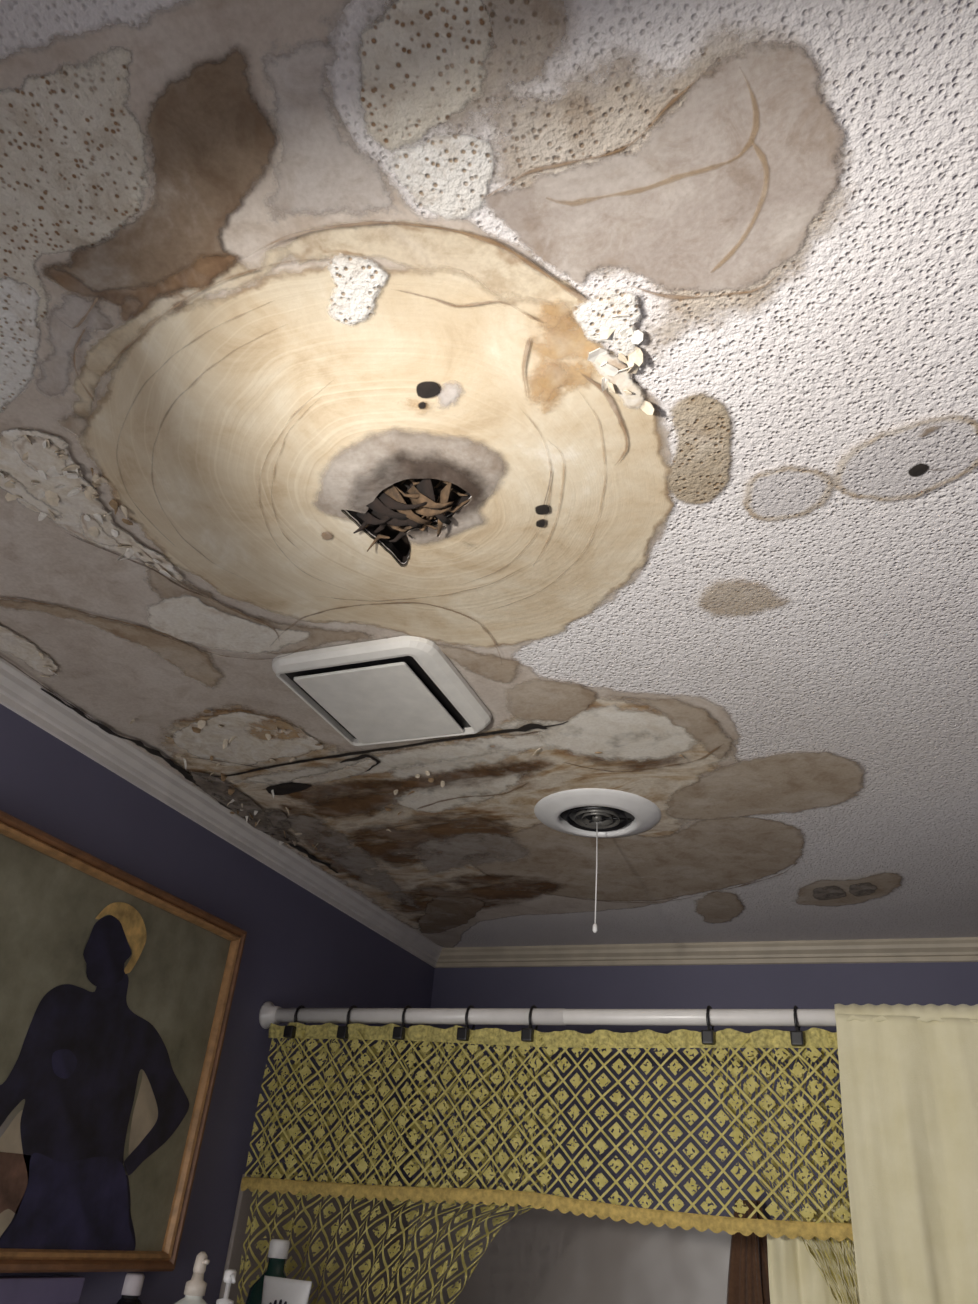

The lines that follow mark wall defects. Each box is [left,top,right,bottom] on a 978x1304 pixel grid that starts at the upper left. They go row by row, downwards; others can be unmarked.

water stain [43,49,589,420]
water stain [654,192,840,343]
water stain [315,429,506,544]
peeling [0,0,845,790]
water stain [666,394,731,504]
water stain [743,415,978,521]
crack [40,688,568,873]
water stain [141,553,864,934]
peeling [284,843,678,948]
water stain [795,873,901,906]